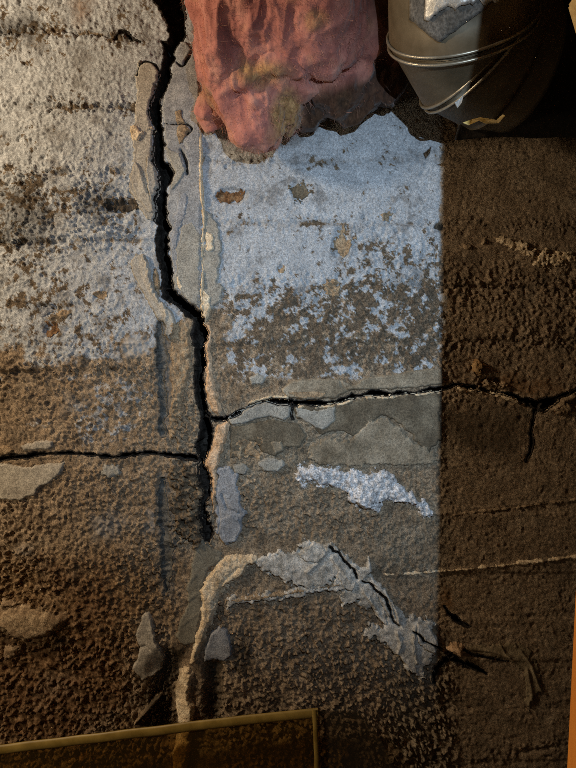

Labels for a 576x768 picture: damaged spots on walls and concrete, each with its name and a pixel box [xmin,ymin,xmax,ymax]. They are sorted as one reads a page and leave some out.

peeling [101,42,225,323]
crack [0,0,576,542]
crack [155,478,175,594]
peeling [165,367,443,645]
peeling [204,626,233,662]
peeling [226,538,438,680]
crack [329,546,508,684]